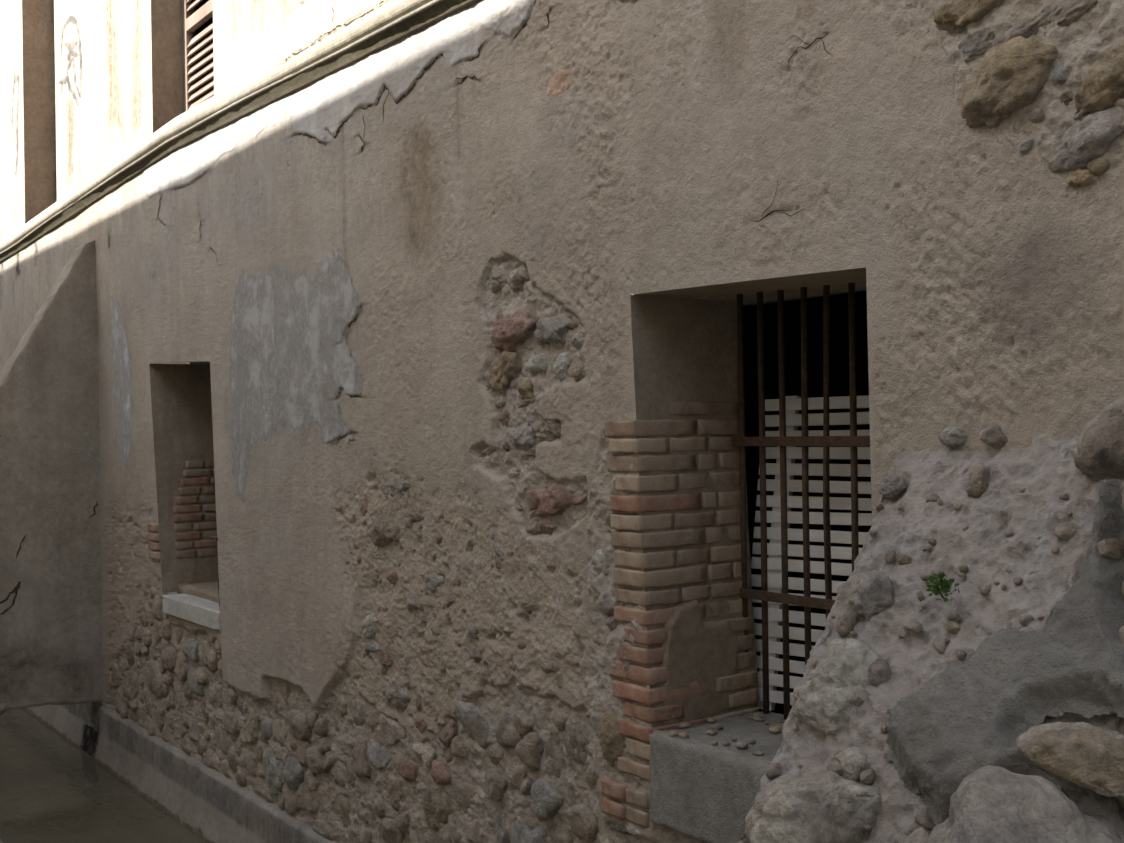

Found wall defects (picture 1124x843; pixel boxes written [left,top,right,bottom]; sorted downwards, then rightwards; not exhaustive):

crack [282,1,386,64]
peeling [144,0,536,199]
crack [0,534,27,615]
spalling [107,255,704,843]